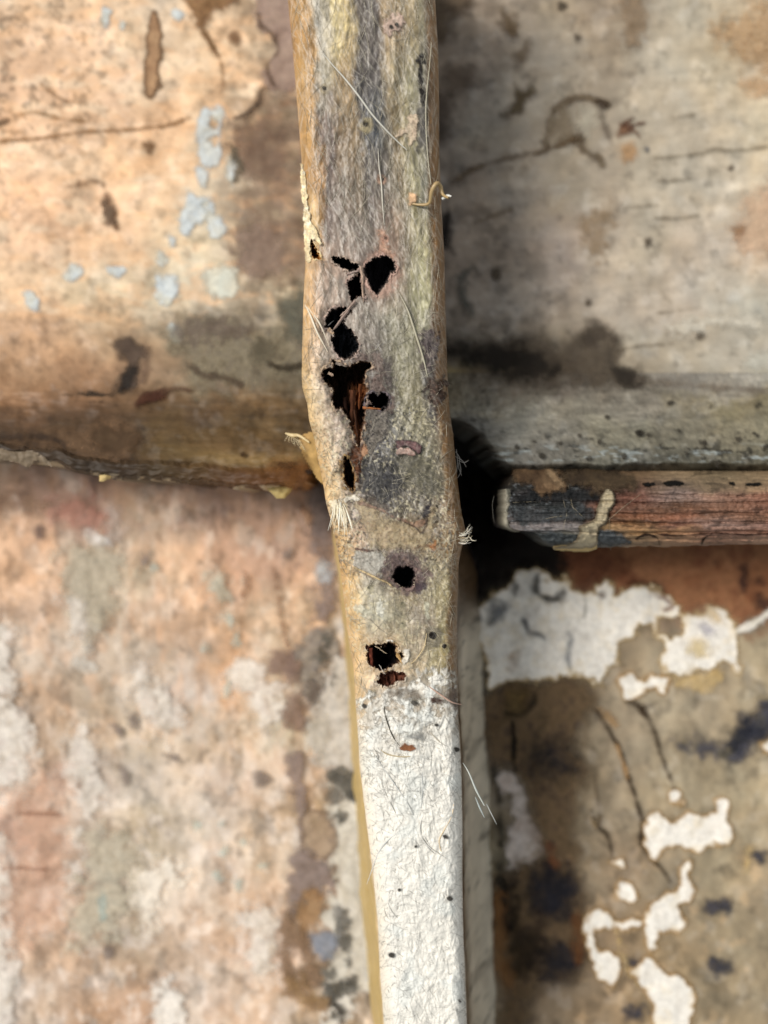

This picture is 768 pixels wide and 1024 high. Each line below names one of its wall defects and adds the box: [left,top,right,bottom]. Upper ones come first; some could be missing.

crack [457,152,535,180]
damp [417,320,671,405]
peeling [479,567,768,701]
peeling [495,771,544,869]
damp [483,676,597,1024]
crack [593,702,675,882]
peeling [582,789,734,1024]